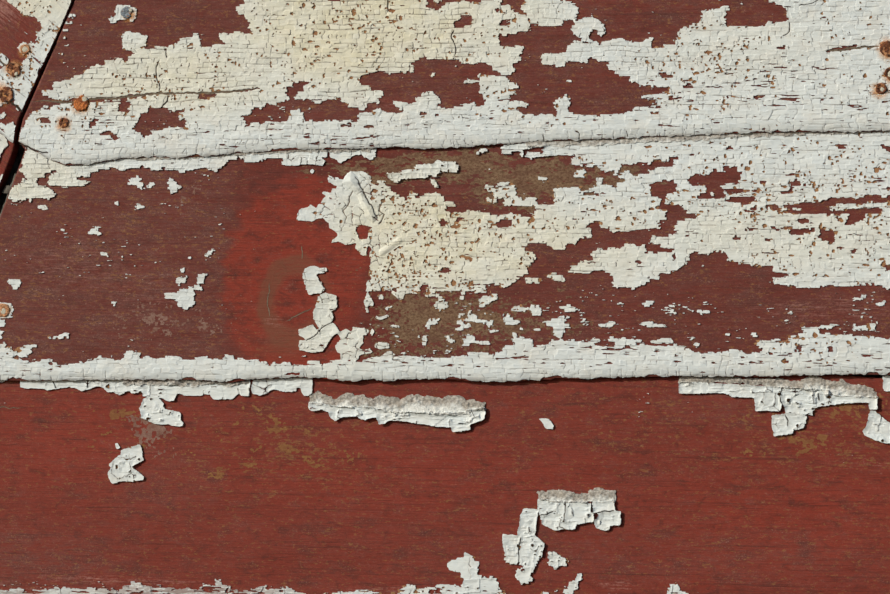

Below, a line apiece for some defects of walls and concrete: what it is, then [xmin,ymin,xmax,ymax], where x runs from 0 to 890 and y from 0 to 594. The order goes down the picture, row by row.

crack [826,44,878,52]
crack [11,50,259,112]
crack [343,178,385,224]
peeling [0,0,890,443]
peeling [502,498,622,585]
peeling [0,579,306,594]
peeling [324,552,506,594]
peeling [541,573,582,594]
peeling [667,582,689,594]